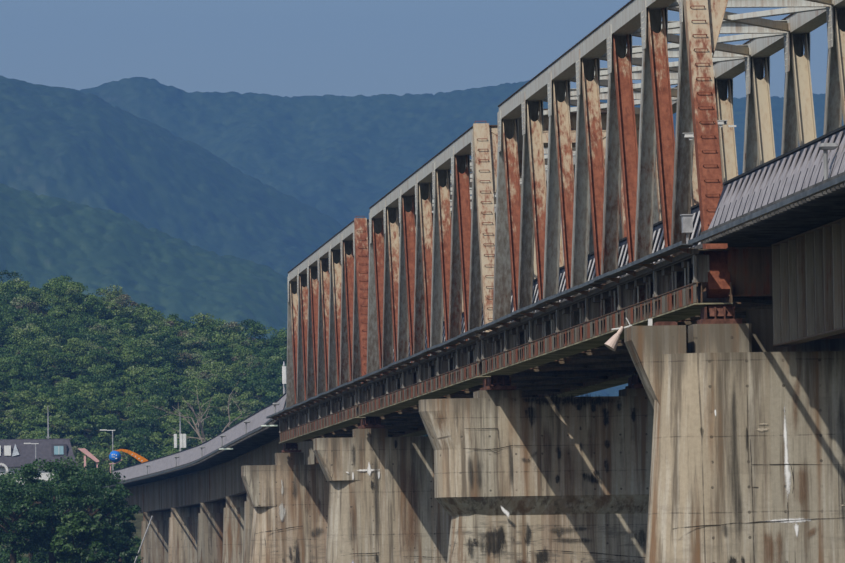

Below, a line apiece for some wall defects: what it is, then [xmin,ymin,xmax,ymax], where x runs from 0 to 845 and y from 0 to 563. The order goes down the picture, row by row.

damp [524,394,620,427]
damp [731,393,741,527]
damp [467,527,514,555]
damp [552,527,590,542]
damp [536,551,548,563]